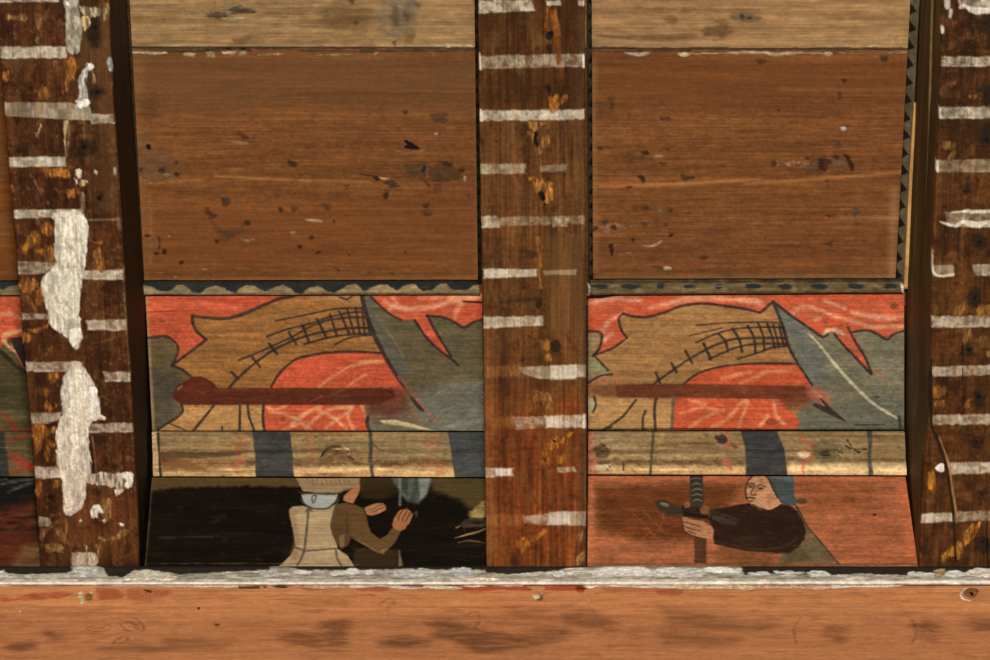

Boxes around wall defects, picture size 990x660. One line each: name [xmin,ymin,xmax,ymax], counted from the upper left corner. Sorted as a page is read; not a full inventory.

peeling [72,215,87,240]
peeling [56,268,82,347]
peeling [68,369,106,450]
crack [928,359,958,561]
peeling [114,472,133,494]
peeling [24,557,98,586]
peeling [109,567,522,593]
peeling [584,567,901,591]
peeling [933,568,990,578]